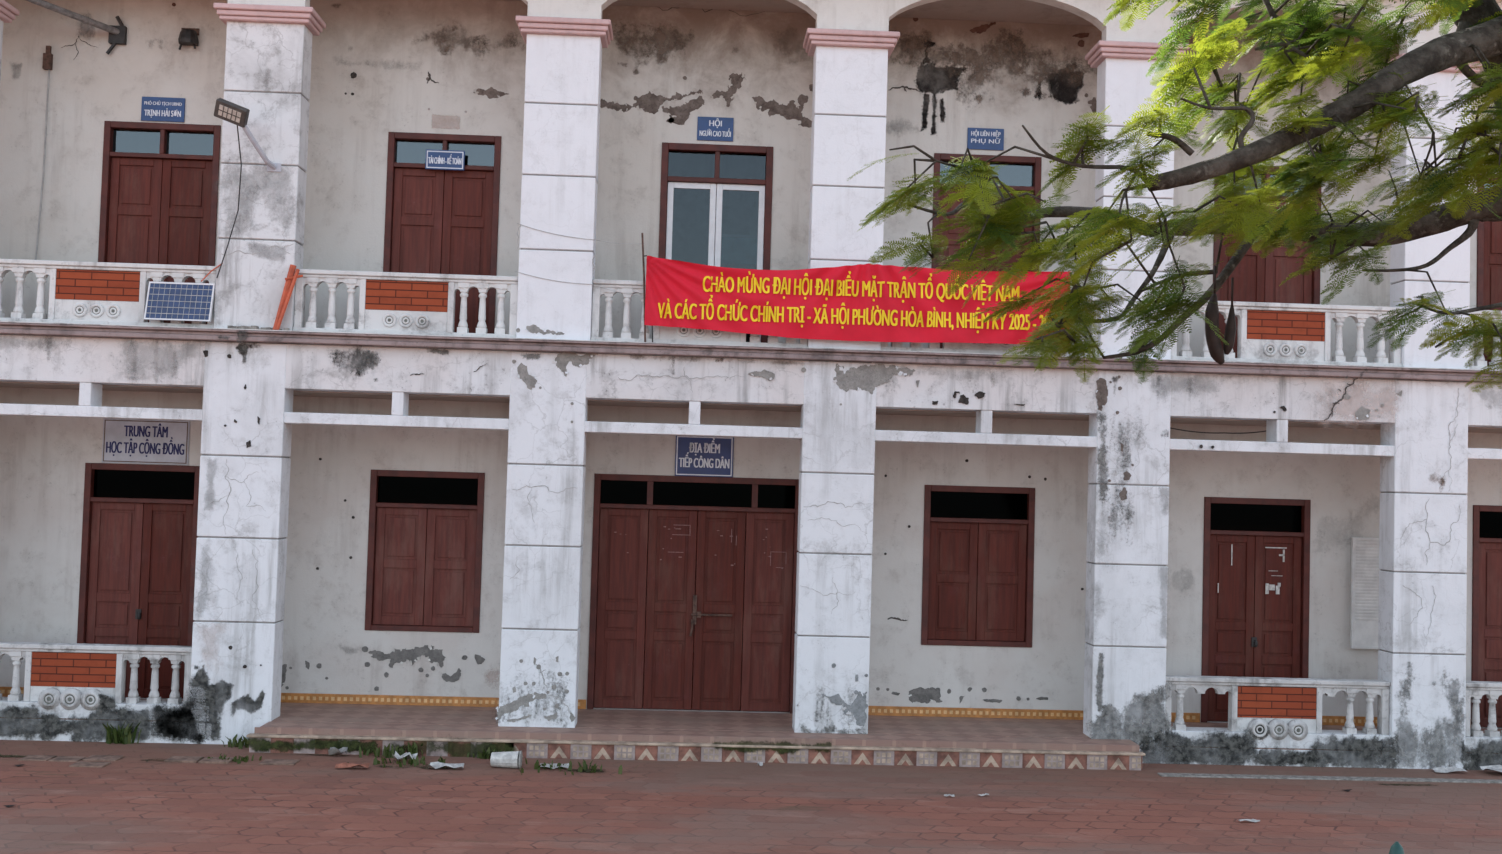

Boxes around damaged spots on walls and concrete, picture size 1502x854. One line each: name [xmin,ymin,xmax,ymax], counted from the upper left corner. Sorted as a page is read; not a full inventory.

peeling [600,73,813,128]
water stain [218,330,255,363]
peeling [833,362,920,405]
spalling [932,391,985,405]
crack [1401,388,1461,635]
peeling [362,645,485,691]
water stain [0,665,265,744]
peeling [822,674,1048,728]
water stain [1088,653,1502,771]